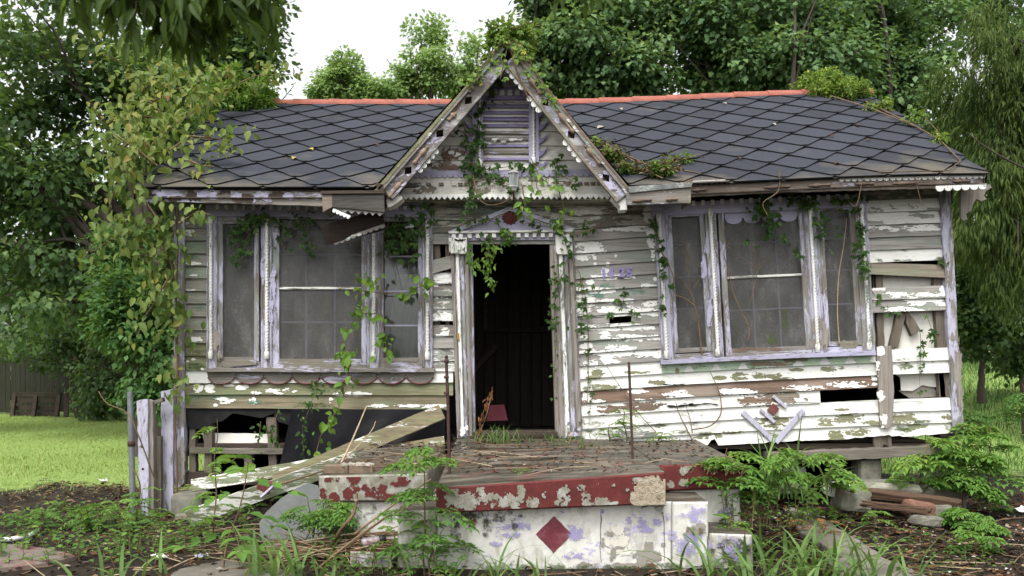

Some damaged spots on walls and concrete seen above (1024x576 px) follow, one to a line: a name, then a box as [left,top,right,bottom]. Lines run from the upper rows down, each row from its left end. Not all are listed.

peeling [426,147,466,171]
peeling [867,207,941,232]
peeling [701,237,718,327]
peeling [567,205,693,414]
peeling [872,286,946,312]
peeling [711,317,928,440]
peeling [941,332,964,420]
peeling [185,382,297,407]
peeling [329,380,446,408]
peeling [697,431,744,439]
peeling [320,477,411,502]
peeling [439,466,759,569]